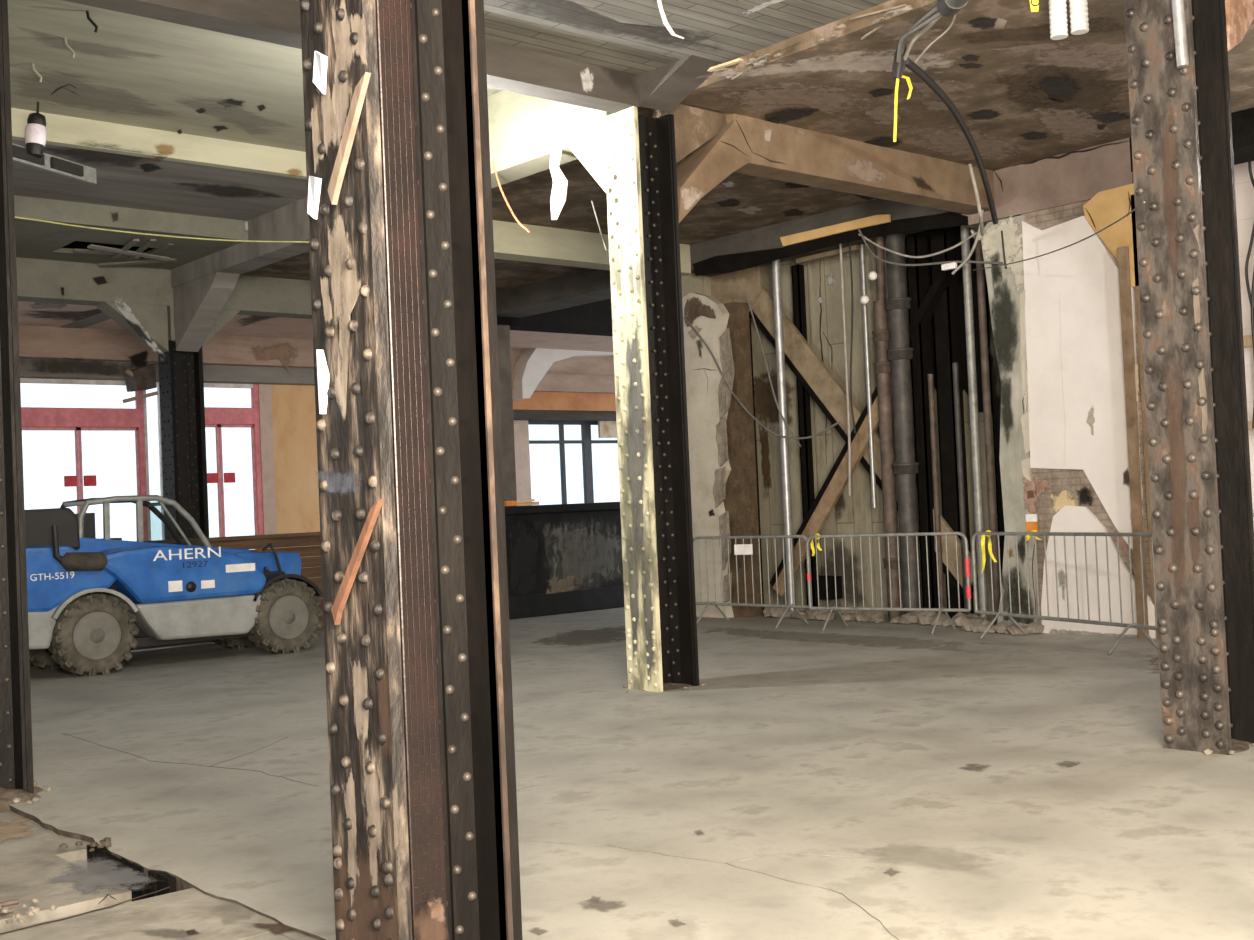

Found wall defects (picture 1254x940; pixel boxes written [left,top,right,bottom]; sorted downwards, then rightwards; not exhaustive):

peeling [311,0,367,172]
damp [960,24,1051,44]
damp [1067,18,1120,36]
peeling [320,215,361,419]
damp [991,254,1017,442]
spalling [971,215,1152,638]
rust [1166,380,1200,593]
crack [65,734,316,786]
peeling [342,660,400,907]
rust [337,854,399,940]
rust [415,898,446,940]
crack [518,840,899,940]